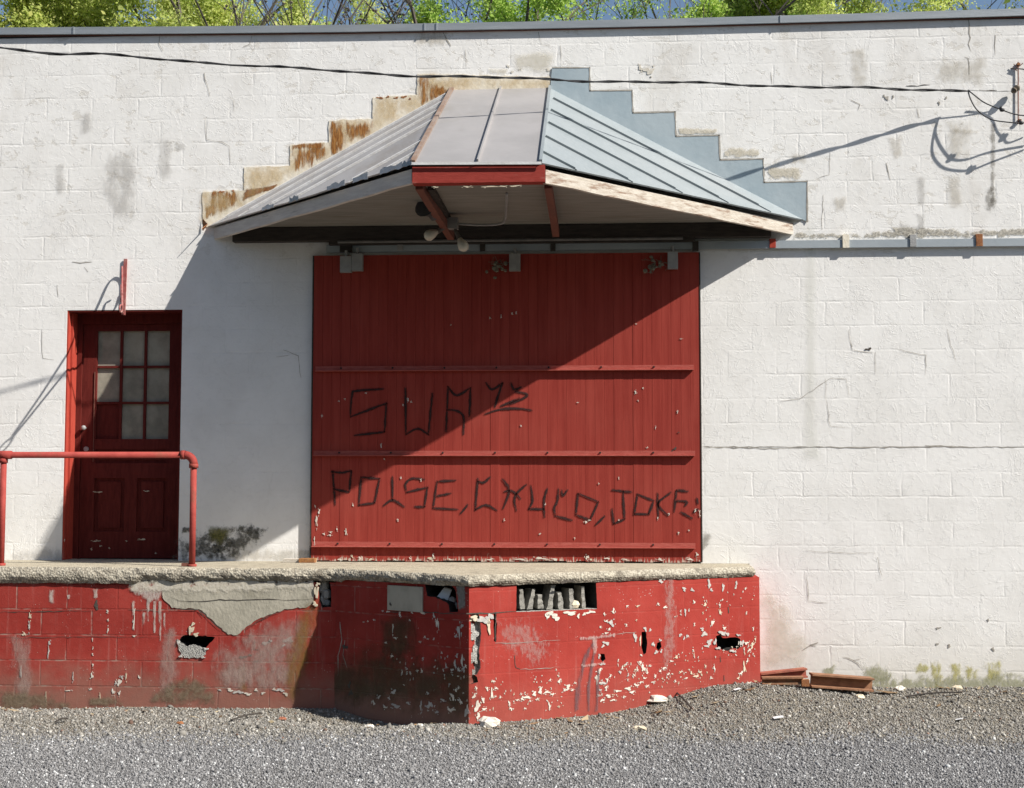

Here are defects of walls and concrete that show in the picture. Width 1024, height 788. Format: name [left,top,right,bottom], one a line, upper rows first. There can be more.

corrosion [293,122,368,169]
corrosion [205,184,277,218]
crack [704,378,1015,449]
leakage [173,526,263,560]
spalling [177,622,209,658]
leakage [334,621,470,706]
spalling [371,586,576,721]
spalling [516,579,756,703]
leakage [872,664,1024,688]